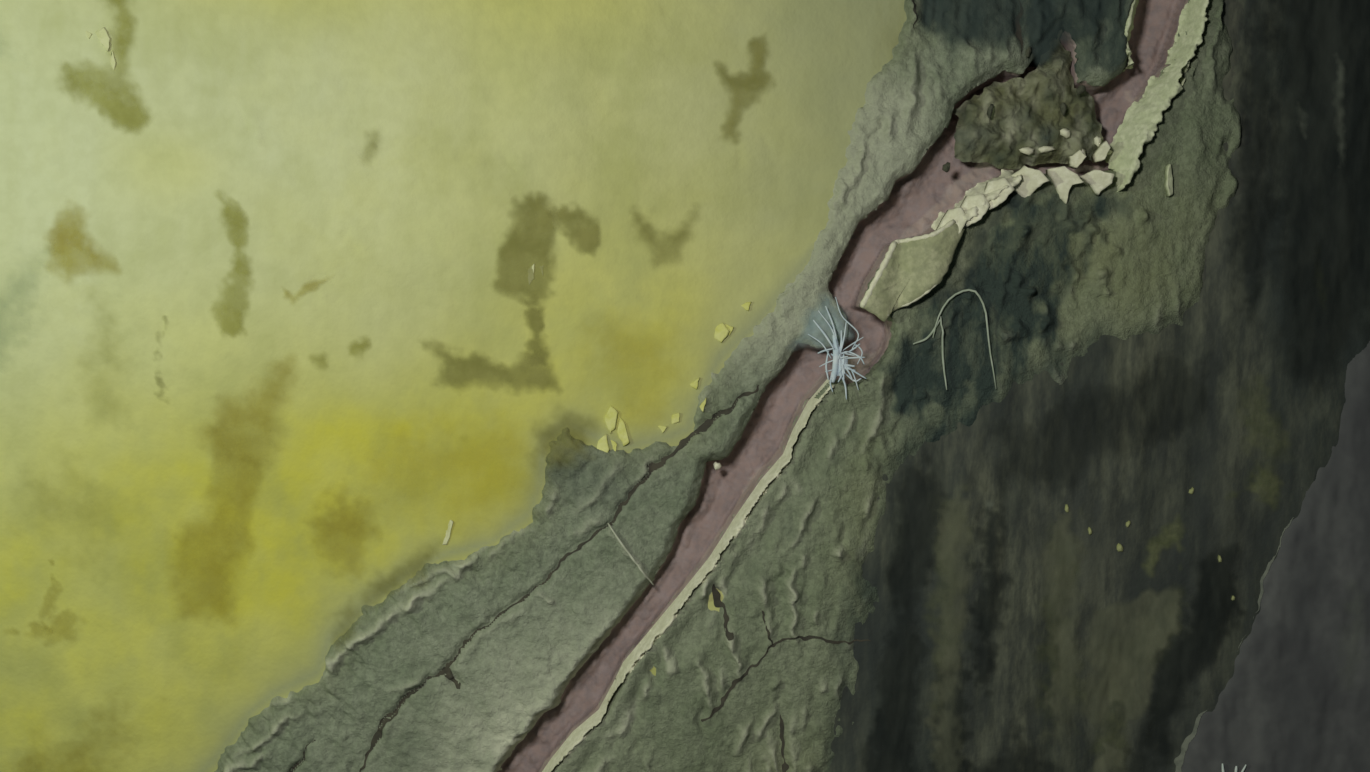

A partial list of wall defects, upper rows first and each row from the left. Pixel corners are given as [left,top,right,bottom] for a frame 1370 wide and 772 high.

damp [68,71,146,129]
damp [721,40,767,134]
spalling [860,0,1209,322]
damp [224,207,248,276]
damp [218,303,241,335]
damp [444,197,598,388]
peeling [714,323,734,343]
crack [359,0,1188,772]
spalling [542,379,834,772]
crack [289,740,316,772]